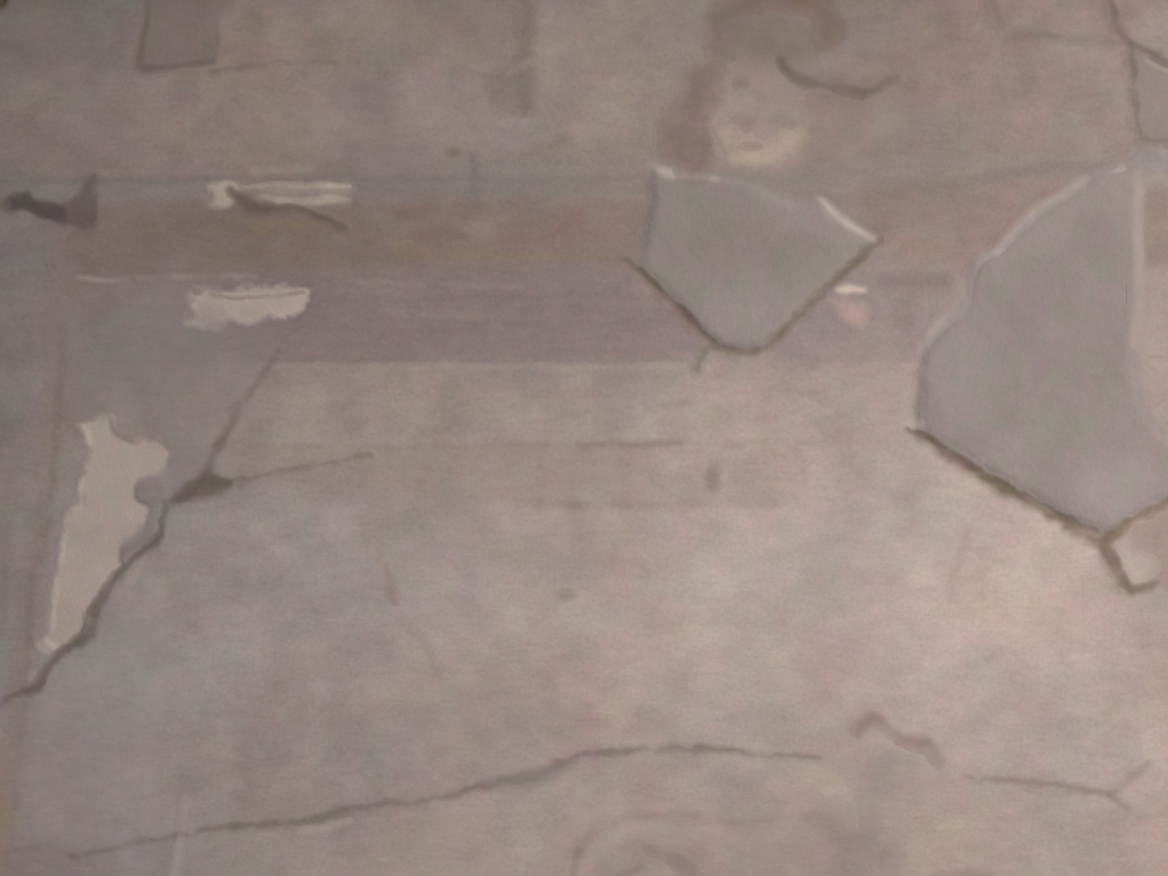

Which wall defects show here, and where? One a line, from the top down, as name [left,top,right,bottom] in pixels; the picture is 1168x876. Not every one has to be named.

crack [977,0,1168,150]
peeling [204,161,359,235]
peeling [187,280,314,321]
peeling [19,413,173,683]
crack [0,347,378,711]
crack [901,426,1168,600]
crack [149,738,825,847]
crack [959,757,1168,826]